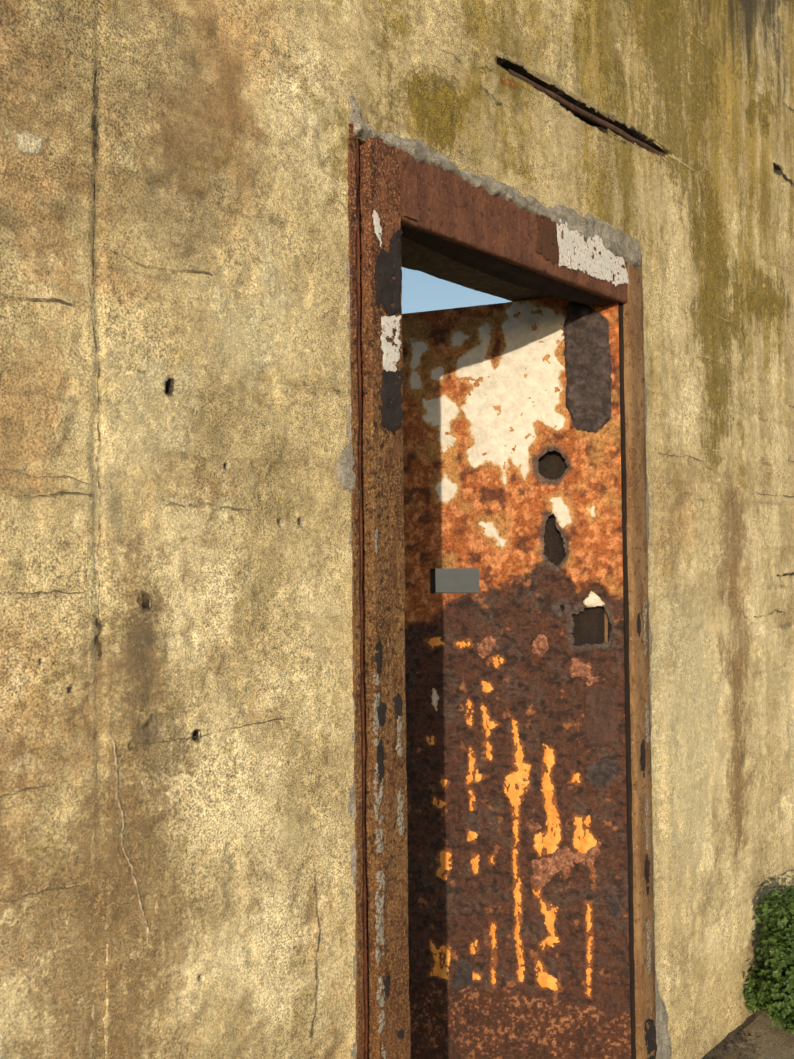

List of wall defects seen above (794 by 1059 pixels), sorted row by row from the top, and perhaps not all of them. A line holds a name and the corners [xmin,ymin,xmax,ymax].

leakage [725,0,780,64]